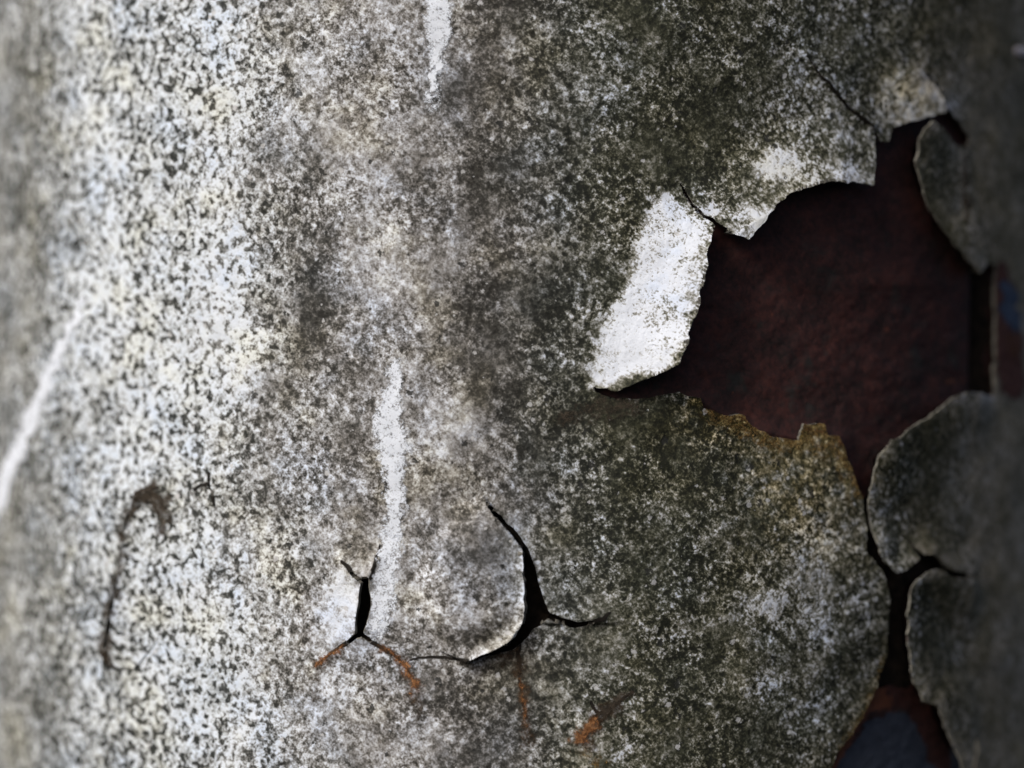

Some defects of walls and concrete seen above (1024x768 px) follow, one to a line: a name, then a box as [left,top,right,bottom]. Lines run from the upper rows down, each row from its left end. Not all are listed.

damp [423,0,453,111]
damp [366,357,412,641]
peeling [589,59,996,768]
crack [316,507,611,718]
corrosion [568,691,636,768]